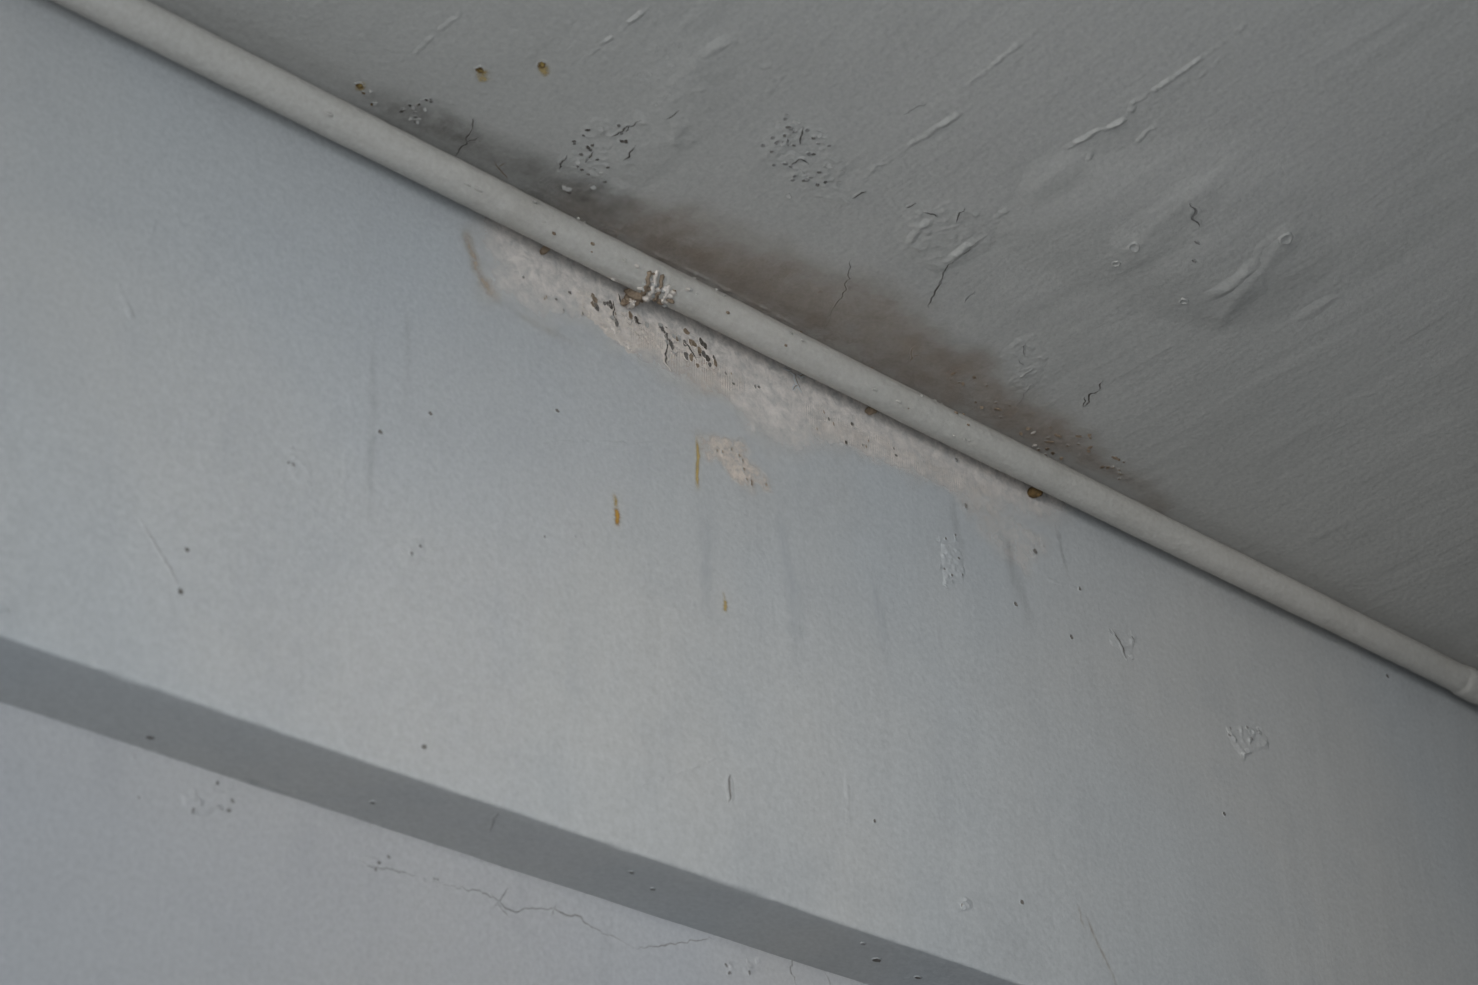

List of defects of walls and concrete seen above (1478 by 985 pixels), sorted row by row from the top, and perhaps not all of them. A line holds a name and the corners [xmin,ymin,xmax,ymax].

flaking render [553,115,635,201]
flaking render [543,290,735,385]
damp [470,222,1061,513]
crack [358,860,714,950]